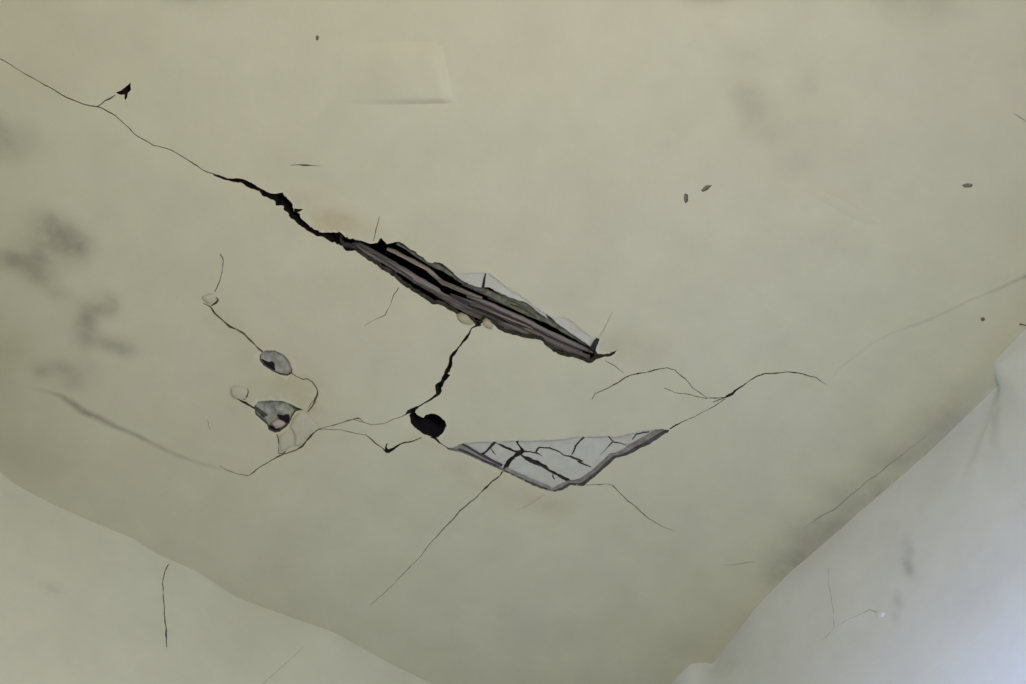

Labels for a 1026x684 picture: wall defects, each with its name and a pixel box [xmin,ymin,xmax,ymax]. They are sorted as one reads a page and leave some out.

crack [0,59,380,251]
crack [203,254,263,352]
spalling [260,350,292,376]
spalling [254,400,302,433]
crack [221,319,481,476]
crack [592,360,825,429]
spalling [552,429,669,492]
crack [372,472,503,604]
crack [591,484,671,530]
crack [161,565,169,647]